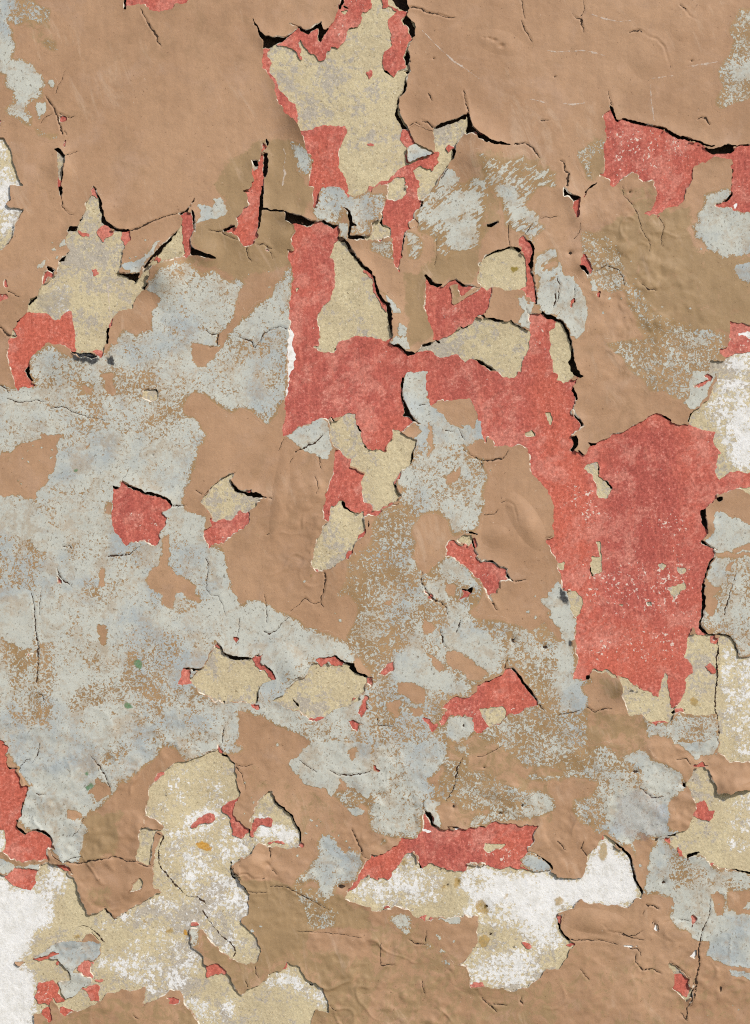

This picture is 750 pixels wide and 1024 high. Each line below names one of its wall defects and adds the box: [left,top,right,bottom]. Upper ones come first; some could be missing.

crack [128,213,177,231]
peeling [0,186,357,1024]
peeling [223,0,750,992]